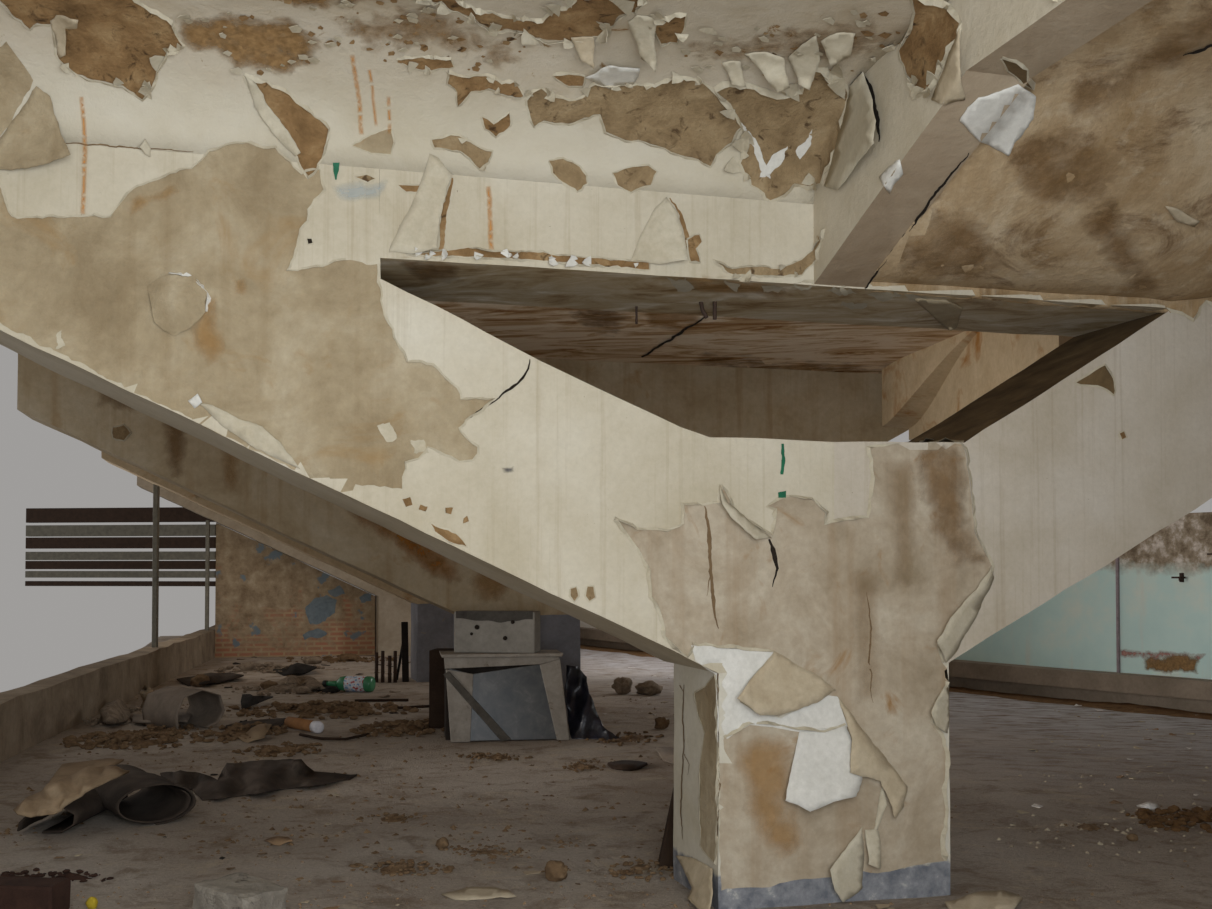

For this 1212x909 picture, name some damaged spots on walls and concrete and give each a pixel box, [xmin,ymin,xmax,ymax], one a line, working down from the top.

crack [66,142,191,152]
peeling [0,0,1036,548]
peeling [870,282,1212,322]
crack [641,317,704,357]
crack [472,359,530,417]
peeling [1075,363,1117,396]
corrosion [381,526,449,573]
crack [704,506,719,629]
crack [768,539,779,587]
peeling [613,438,995,909]